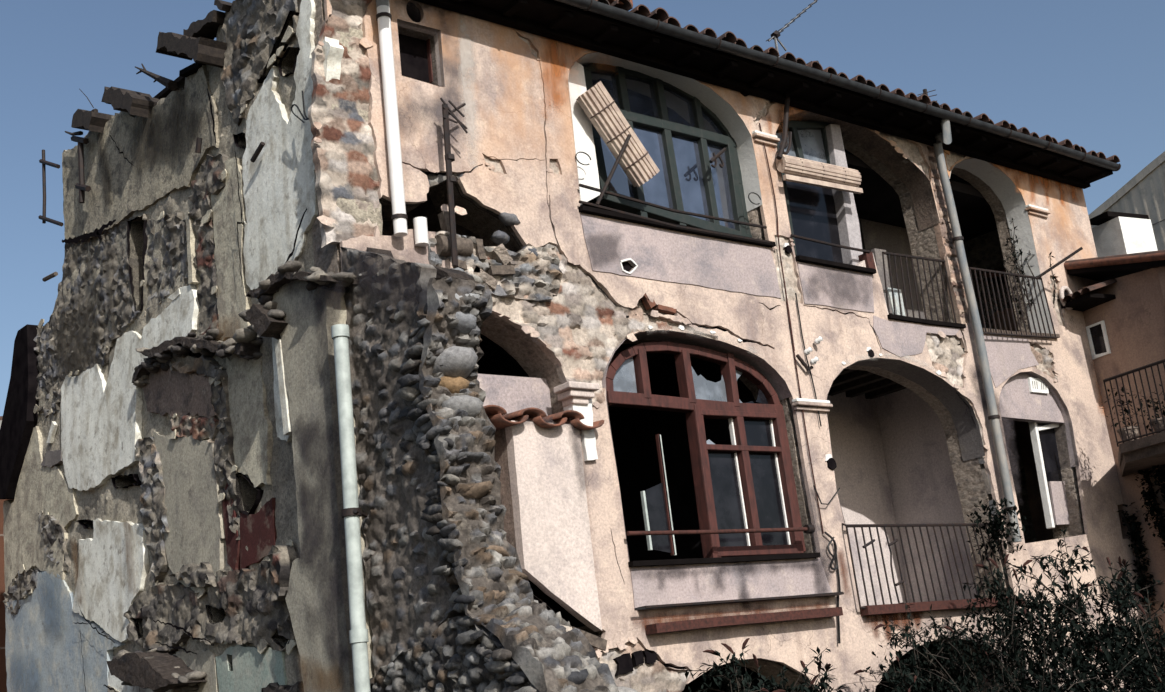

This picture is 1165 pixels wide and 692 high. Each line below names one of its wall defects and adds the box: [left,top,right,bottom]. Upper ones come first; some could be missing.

flaking render [33,0,300,443]
flaking render [317,215,336,226]
crack [420,160,518,176]
flaking render [379,164,716,422]
crack [584,273,637,318]
crack [692,324,766,346]
flaking render [873,130,1007,540]
flaking render [147,352,264,541]
flaking render [3,510,94,616]
flaking render [111,437,298,671]
flaking render [261,681,304,692]
flaking render [528,579,691,692]